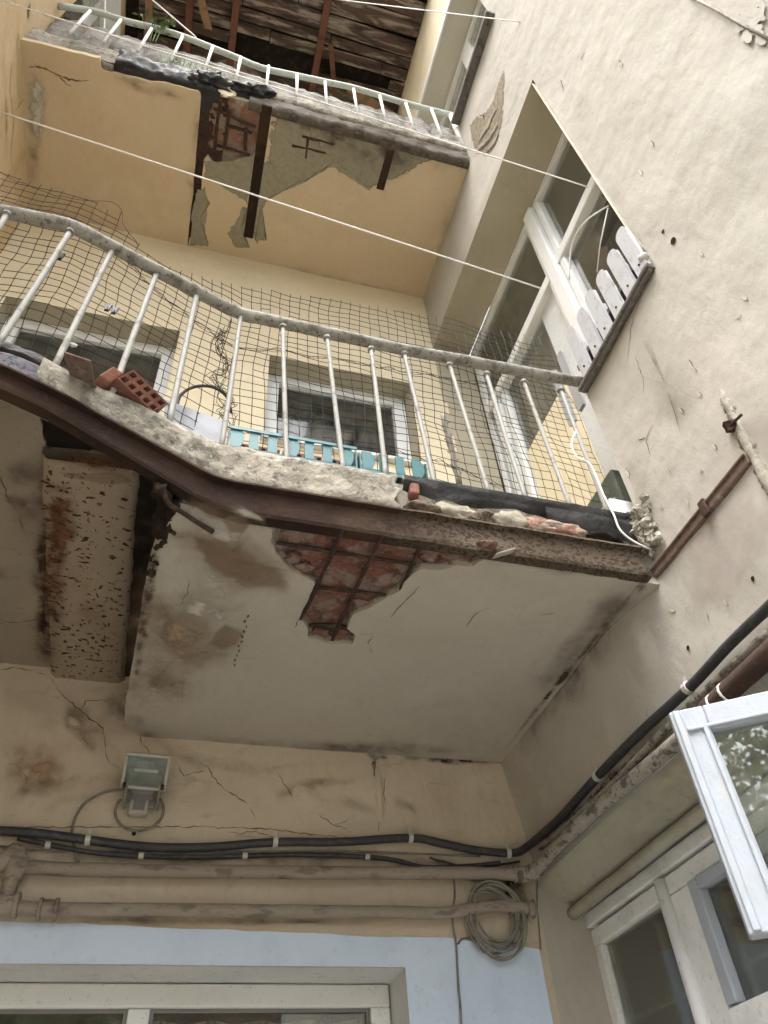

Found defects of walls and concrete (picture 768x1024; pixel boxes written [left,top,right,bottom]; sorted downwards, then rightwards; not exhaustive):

crack [10,64,88,164]
peeling [24,27,431,248]
peeling [470,70,504,154]
corrosion [41,460,132,673]
spalling [271,528,515,641]
crack [1,667,120,769]
water stain [536,666,578,710]
crack [9,761,351,838]
crack [372,757,386,832]